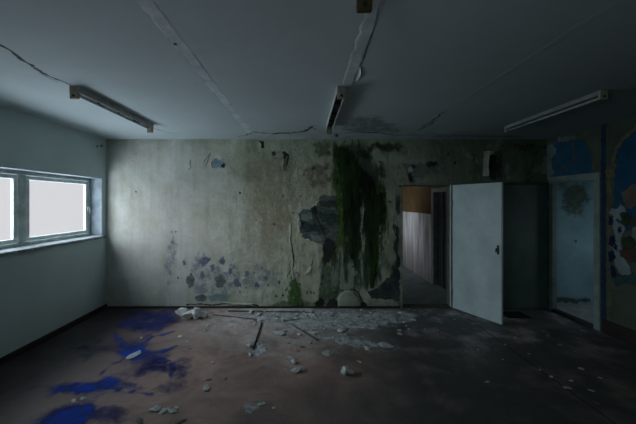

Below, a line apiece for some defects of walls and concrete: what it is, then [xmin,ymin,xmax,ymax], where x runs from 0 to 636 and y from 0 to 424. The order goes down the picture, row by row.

crack [0,44,71,85]
crack [351,2,381,86]
crack [239,125,319,137]
crack [287,222,299,280]
spalling [292,194,340,306]
water stain [315,142,403,289]
spalling [360,195,400,306]